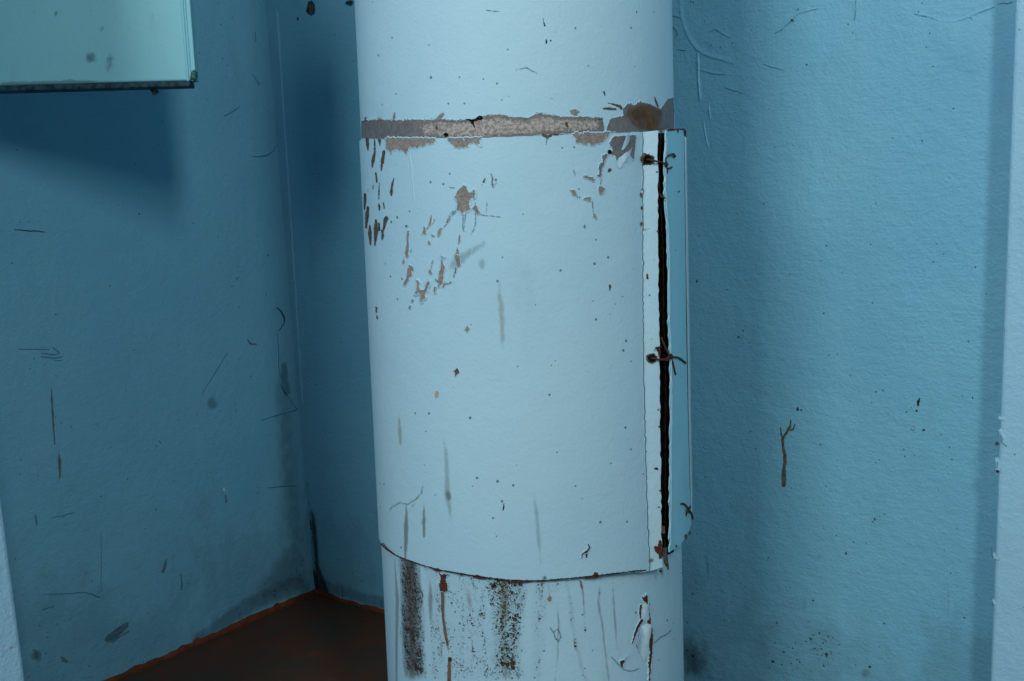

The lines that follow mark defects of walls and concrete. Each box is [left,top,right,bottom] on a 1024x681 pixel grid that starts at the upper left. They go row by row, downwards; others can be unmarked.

peeling [361,91,675,548]
rust [381,105,691,681]
peeling [611,593,672,681]